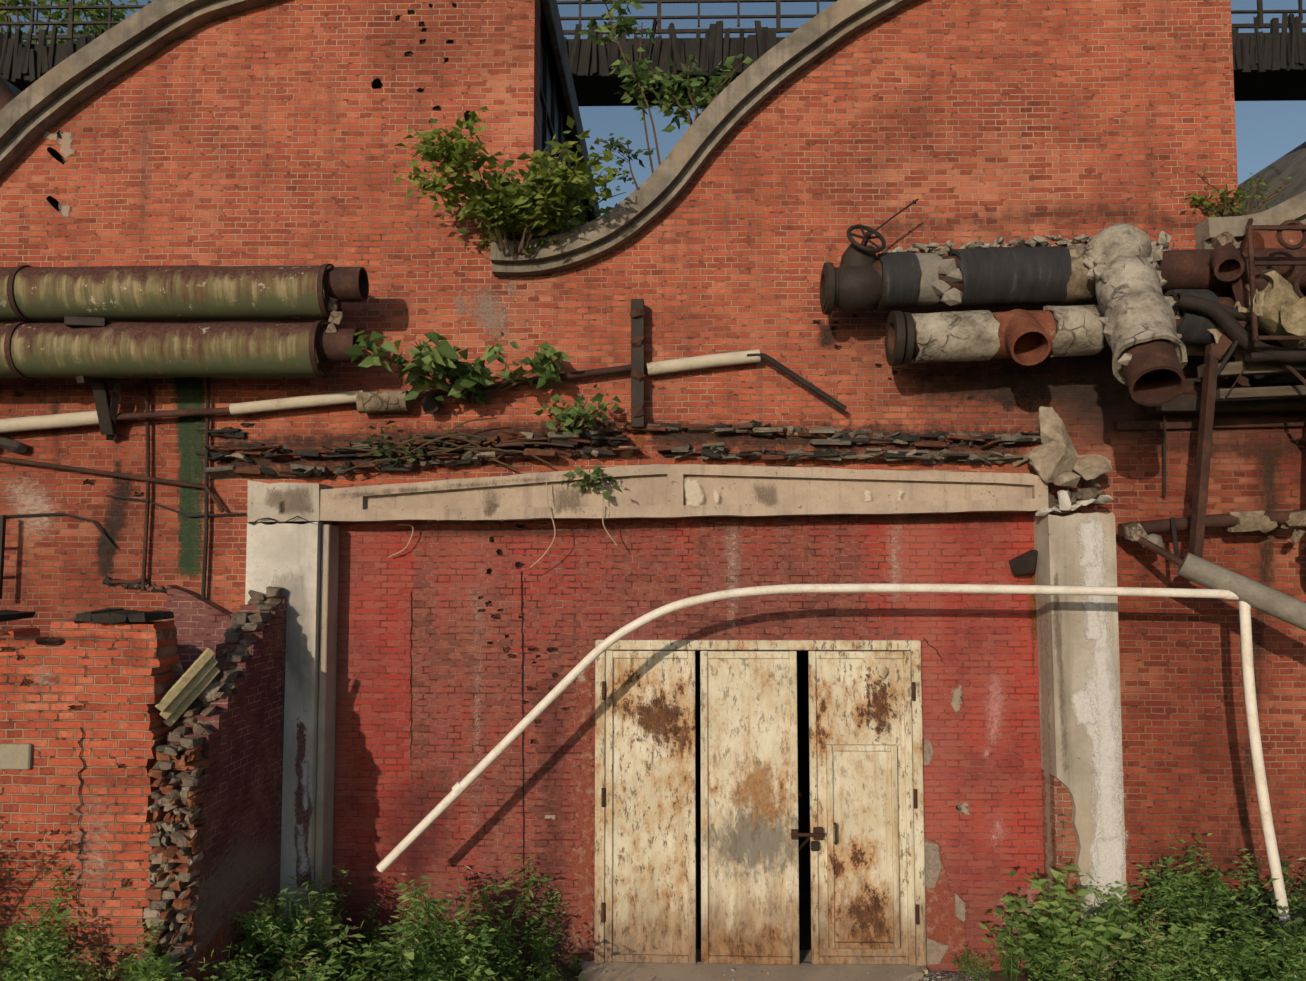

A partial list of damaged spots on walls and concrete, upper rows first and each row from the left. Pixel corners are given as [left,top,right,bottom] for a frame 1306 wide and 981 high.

spalling [812,314,857,350]
damp [98,534,115,576]
rust [623,683,689,754]
peeling [196,397,1128,975]
rust [856,674,905,745]
crack [76,727,85,934]
rust [731,761,787,831]
rust [845,889,892,938]